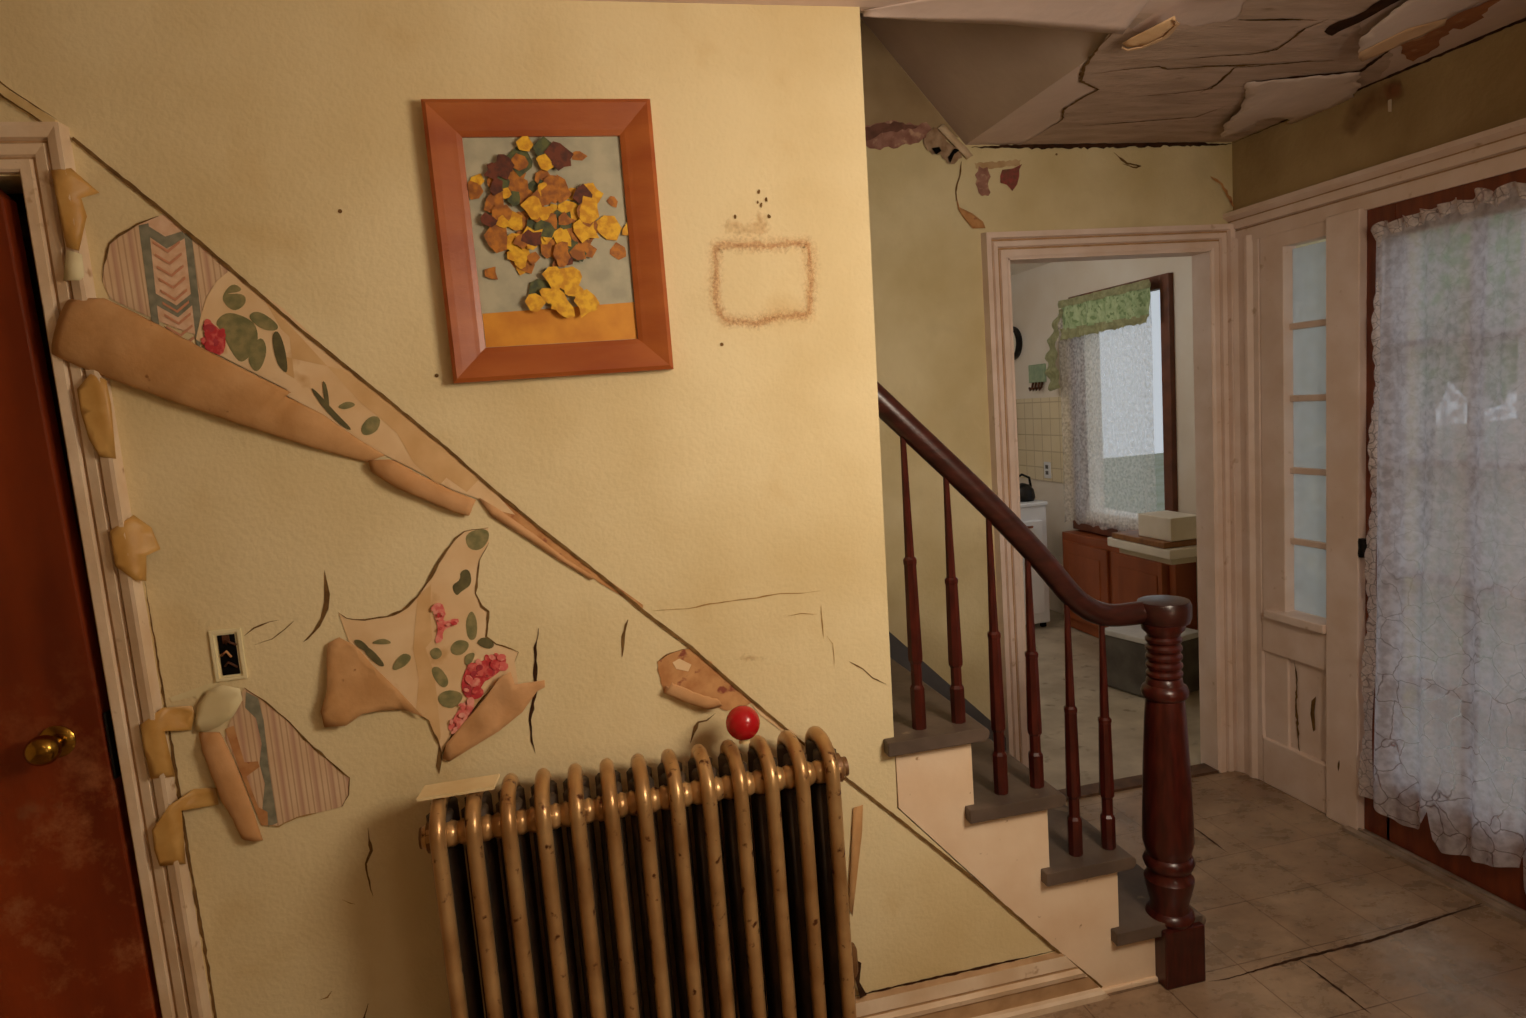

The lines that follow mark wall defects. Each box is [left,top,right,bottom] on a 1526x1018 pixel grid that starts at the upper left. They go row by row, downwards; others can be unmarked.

crack [1085,19,1328,126]
spalling [1400,0,1500,61]
spalling [865,120,1022,196]
crack [0,81,885,746]
crack [1293,663,1301,751]
crack [844,776,1103,988]